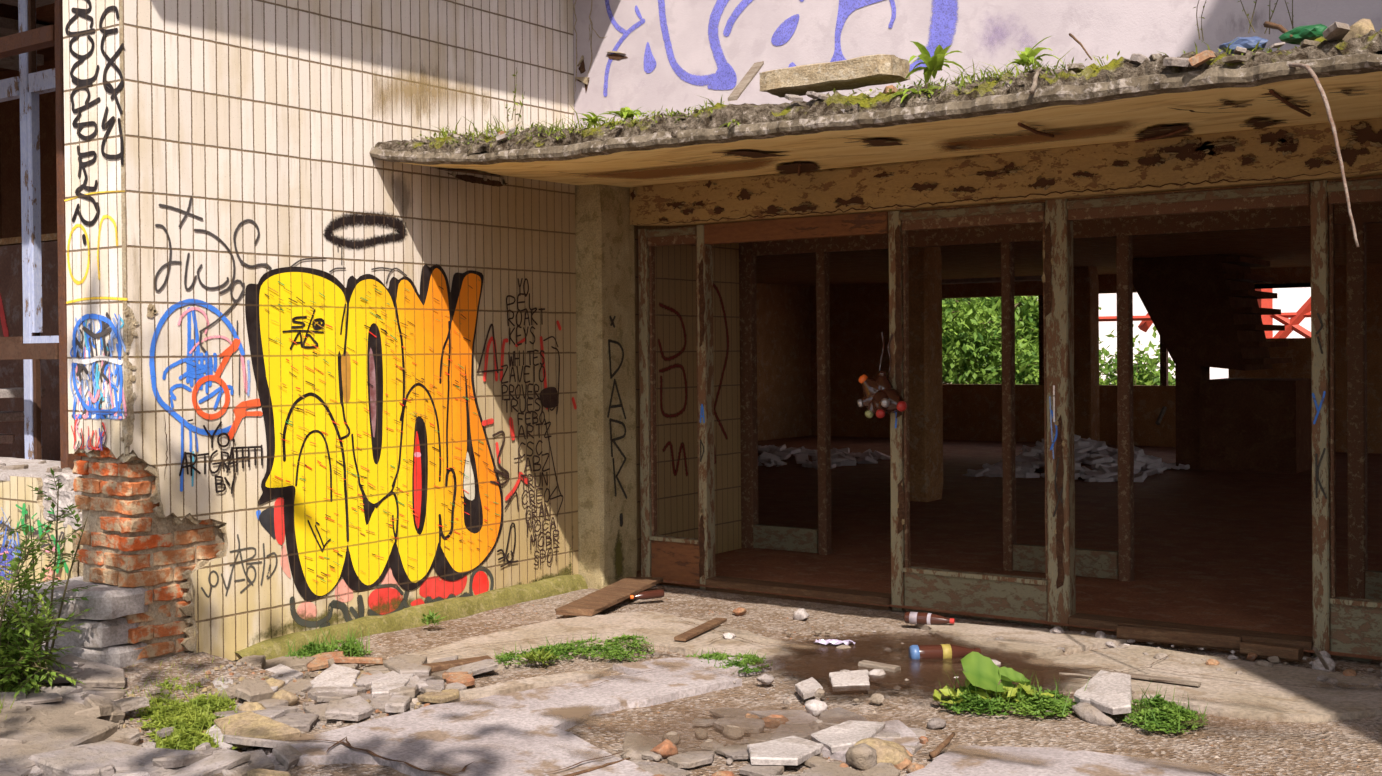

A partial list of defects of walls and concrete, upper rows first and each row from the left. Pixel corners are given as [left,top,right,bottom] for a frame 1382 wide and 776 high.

damp [381,78,462,105]
damp [941,124,1132,152]
spalling [42,304,226,660]